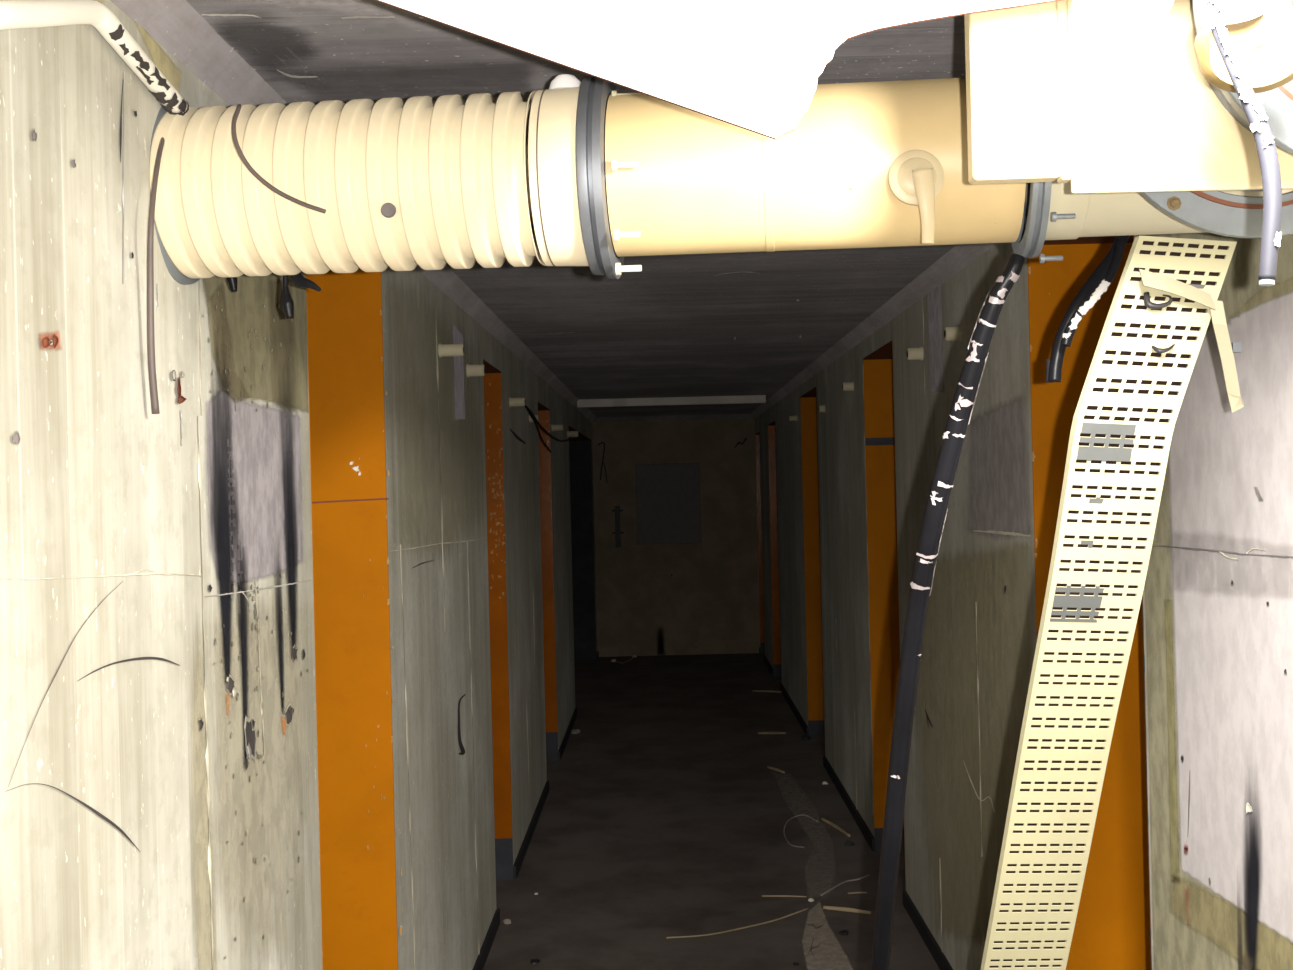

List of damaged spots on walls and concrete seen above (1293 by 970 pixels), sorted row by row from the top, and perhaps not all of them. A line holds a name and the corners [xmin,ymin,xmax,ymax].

damp [203,272,308,584]
crack [8,570,312,787]
damp [1138,232,1293,970]